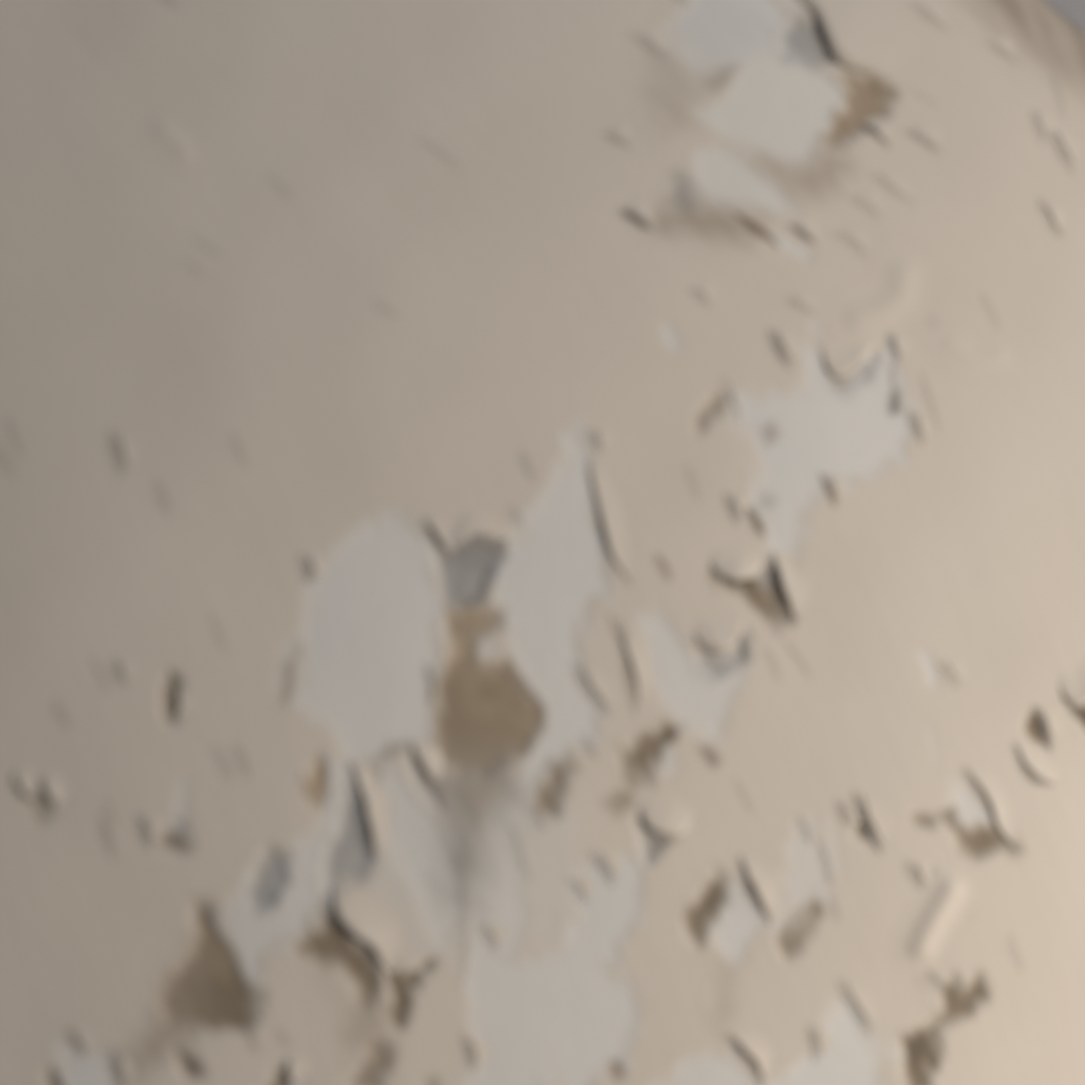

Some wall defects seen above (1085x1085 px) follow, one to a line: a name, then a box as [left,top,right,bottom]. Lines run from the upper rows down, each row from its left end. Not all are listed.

peeling [649,0,924,197]
peeling [618,198,654,231]
peeling [732,210,817,264]
peeling [184,309,999,1085]
peeling [1012,659,1085,787]
peeling [906,766,1029,871]
peeling [41,1027,135,1085]
peeling [178,1048,211,1084]